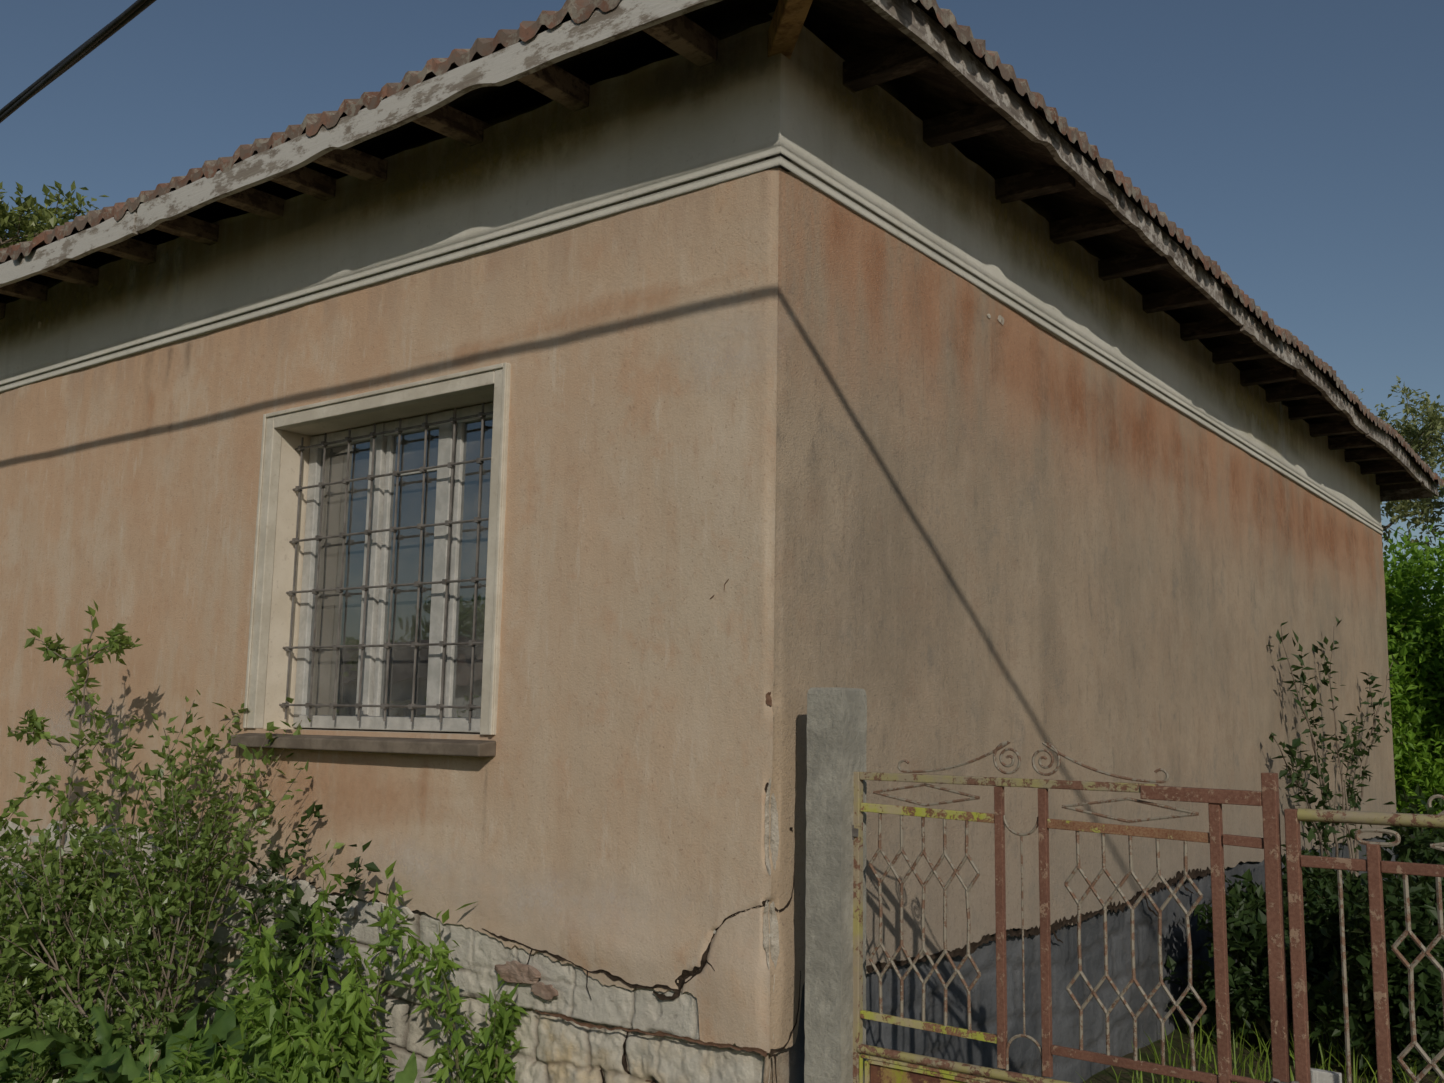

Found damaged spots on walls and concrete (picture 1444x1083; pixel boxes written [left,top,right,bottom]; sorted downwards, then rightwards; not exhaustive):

spalling [494,960,559,1001]
crack [482,827,801,1083]